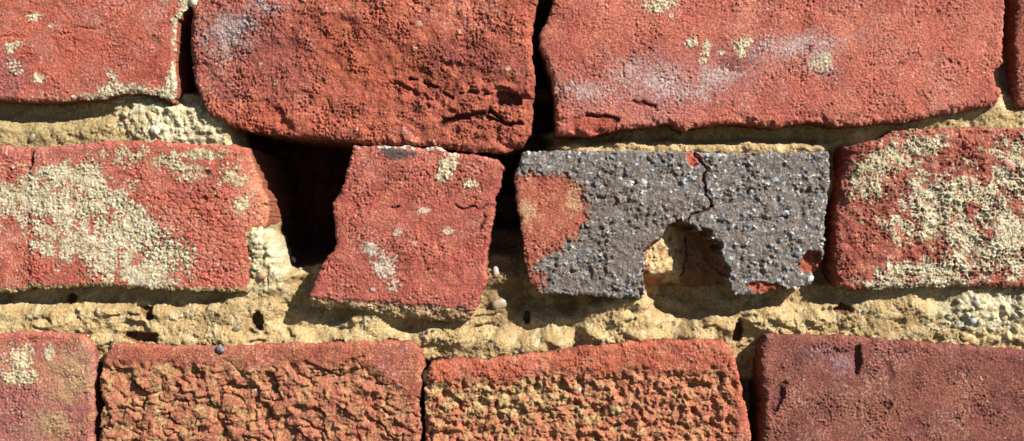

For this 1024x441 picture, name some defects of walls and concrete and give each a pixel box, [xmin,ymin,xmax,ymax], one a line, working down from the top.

water stain [554,29,846,104]
spalling [643,222,726,288]
spalling [99,358,738,441]